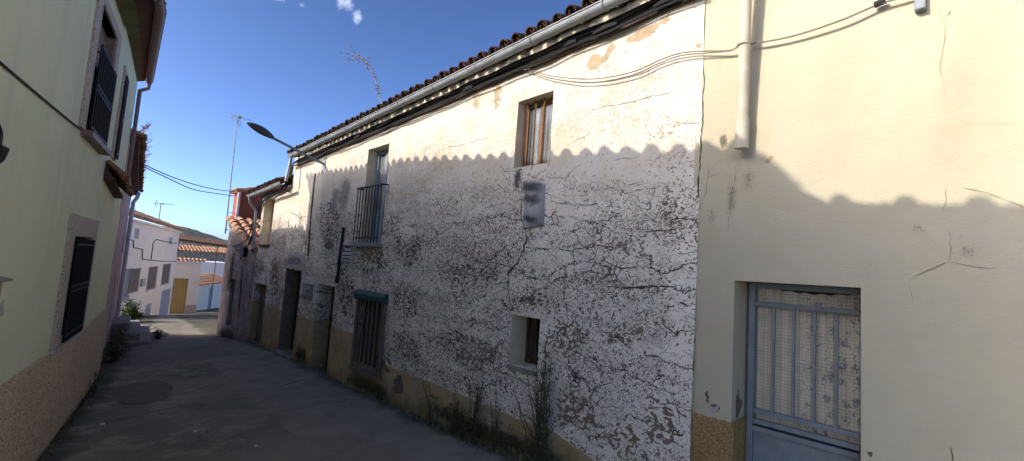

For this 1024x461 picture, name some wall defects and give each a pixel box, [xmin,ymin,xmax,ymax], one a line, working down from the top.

peeling [586,14,670,73]
crack [938,3,1019,125]
crack [567,60,736,227]
crack [444,169,691,313]
crack [909,188,1024,299]
crack [562,340,692,447]